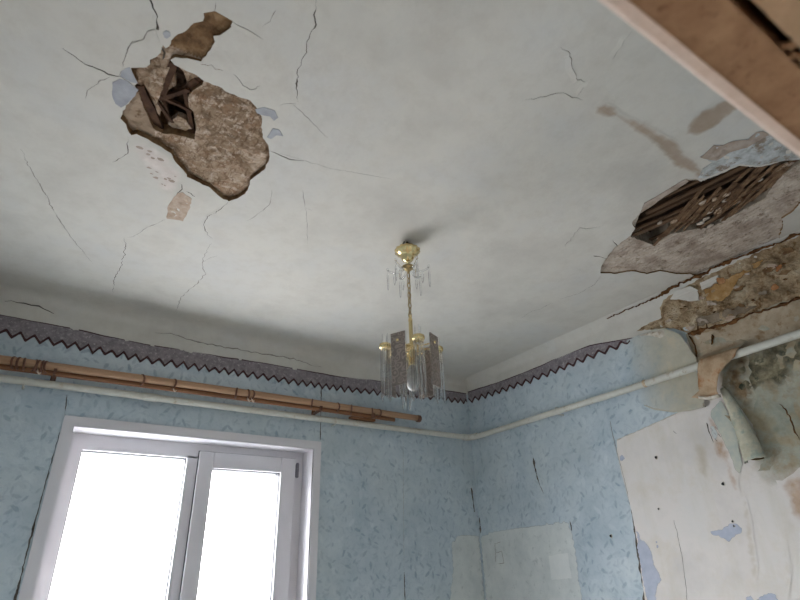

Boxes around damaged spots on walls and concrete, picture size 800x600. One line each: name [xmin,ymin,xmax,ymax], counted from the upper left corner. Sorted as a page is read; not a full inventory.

crack [17,148,93,264]
crack [61,0,166,100]
spalling [121,26,270,221]
crack [177,200,228,308]
crack [231,10,276,43]
crack [282,0,328,138]
water stain [593,99,738,181]
peeling [630,131,800,245]
crack [162,333,320,367]
flaking render [601,270,800,363]
water stain [717,338,800,494]
peeling [617,389,800,600]